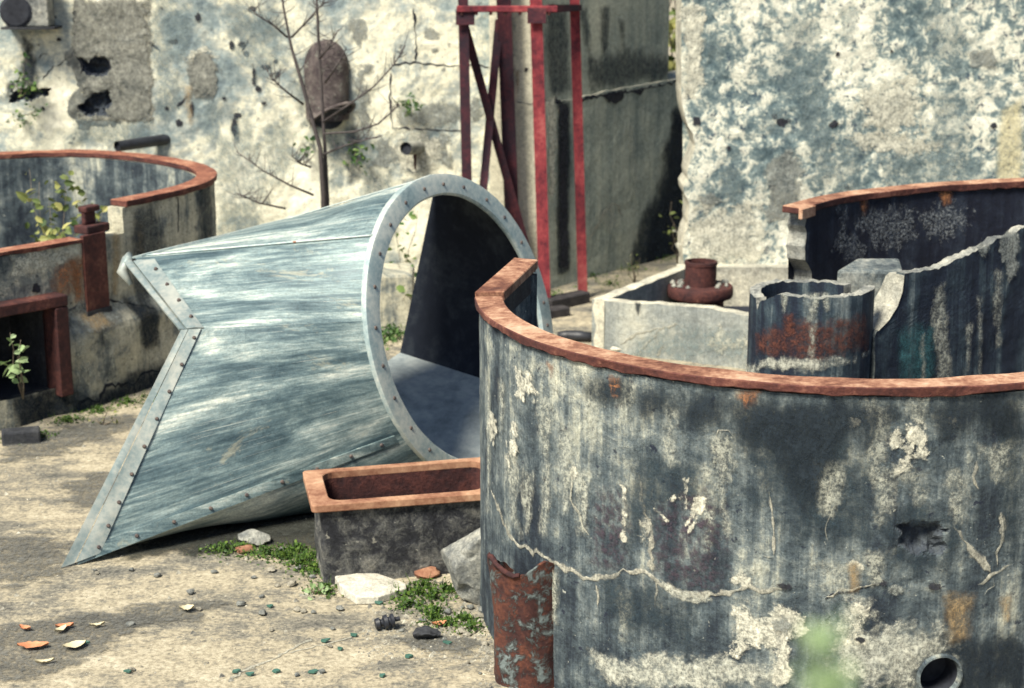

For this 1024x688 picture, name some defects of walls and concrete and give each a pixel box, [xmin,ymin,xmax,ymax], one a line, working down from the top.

flaking render [0,0,226,146]
corrosion [758,315,868,360]
leakage [508,466,548,531]
crack [570,466,589,535]
crack [491,481,780,606]
leakage [541,381,901,640]
crack [825,583,881,599]
flaking render [889,419,928,476]
leakage [915,398,1023,543]
crack [954,514,1009,594]
flaking render [592,604,806,688]
flaking render [836,602,952,688]